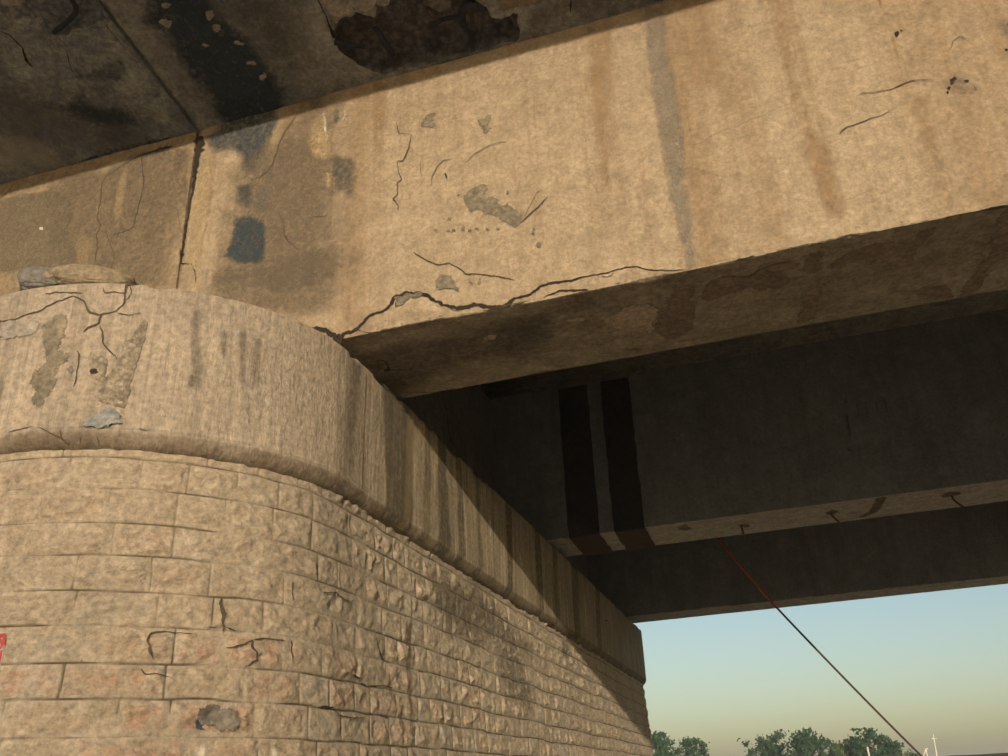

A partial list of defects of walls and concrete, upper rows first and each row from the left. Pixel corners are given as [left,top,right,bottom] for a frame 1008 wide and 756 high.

spalling [321,0,542,75]
water stain [147,0,339,310]
water stain [647,0,693,268]
peeling [434,184,523,233]
crack [0,145,196,386]
crack [312,253,686,344]
crack [141,598,294,677]
spalling [195,704,241,732]